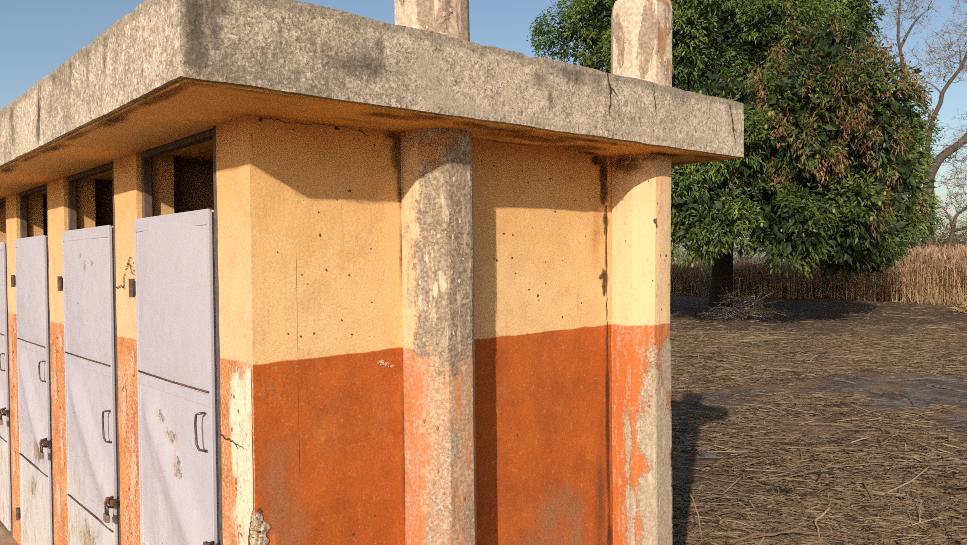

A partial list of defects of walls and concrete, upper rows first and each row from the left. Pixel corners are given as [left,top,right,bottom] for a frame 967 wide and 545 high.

crack [251,117,374,147]
damp [372,111,637,234]
peeling [229,365,271,545]
peeling [623,335,673,545]